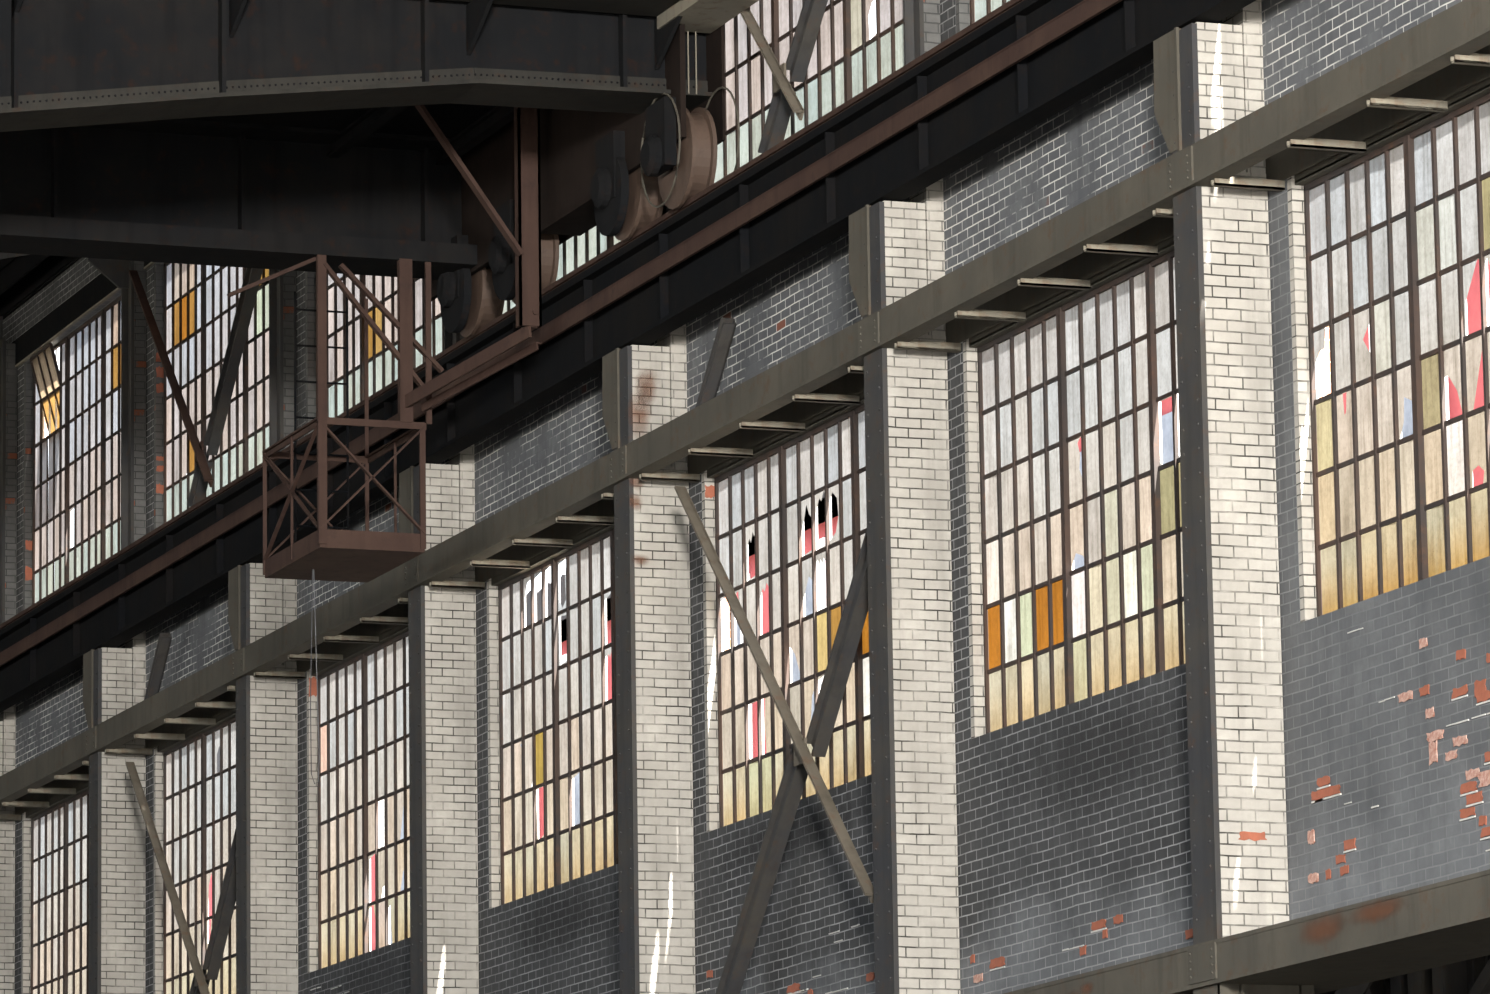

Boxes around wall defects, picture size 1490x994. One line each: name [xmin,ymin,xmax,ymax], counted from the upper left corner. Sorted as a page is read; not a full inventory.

peeling [1451,653,1490,706]
peeling [1397,684,1490,841]
peeling [1311,776,1342,803]
peeling [1307,829,1315,845]
peeling [1308,838,1356,884]